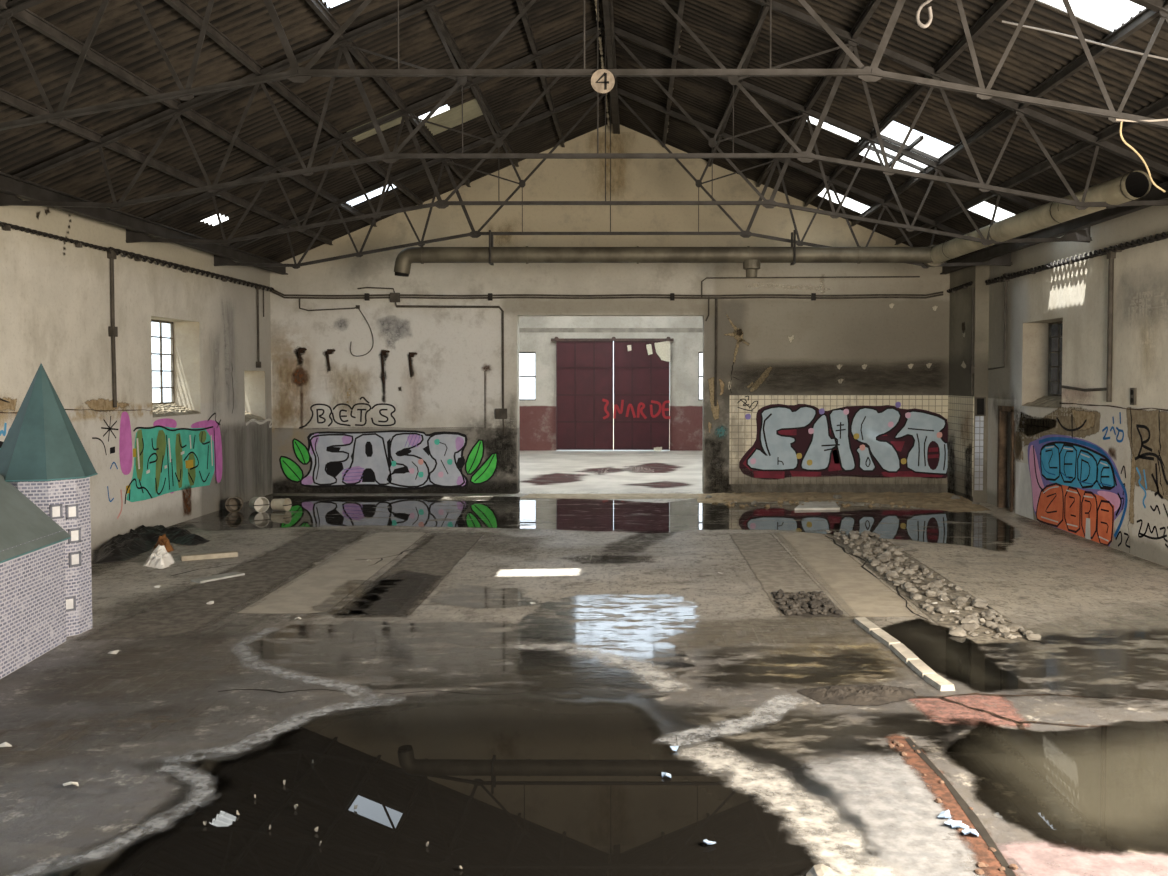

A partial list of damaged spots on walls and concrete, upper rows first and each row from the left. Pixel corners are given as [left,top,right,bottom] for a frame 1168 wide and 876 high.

corrosion [293,347,307,426]
peeling [1127,407,1168,524]